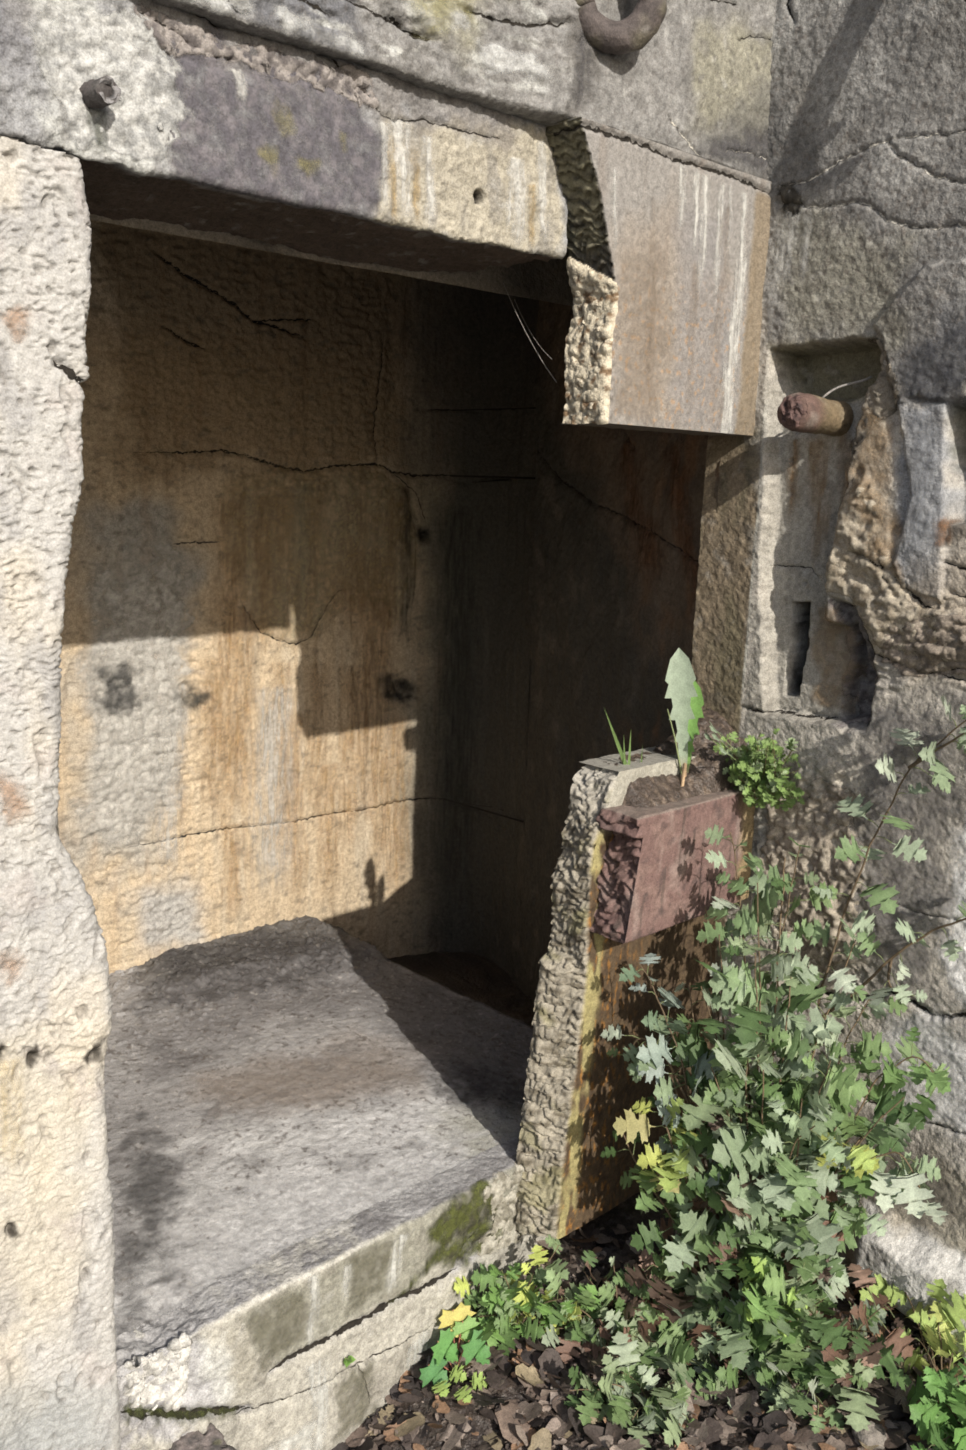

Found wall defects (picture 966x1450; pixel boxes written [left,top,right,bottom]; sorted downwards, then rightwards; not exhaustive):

crack [551,116,966,230]
crack [162,326,204,349]
crack [153,250,311,336]
crack [133,335,699,562]
crack [111,798,524,850]
crack [121,1268,456,1420]